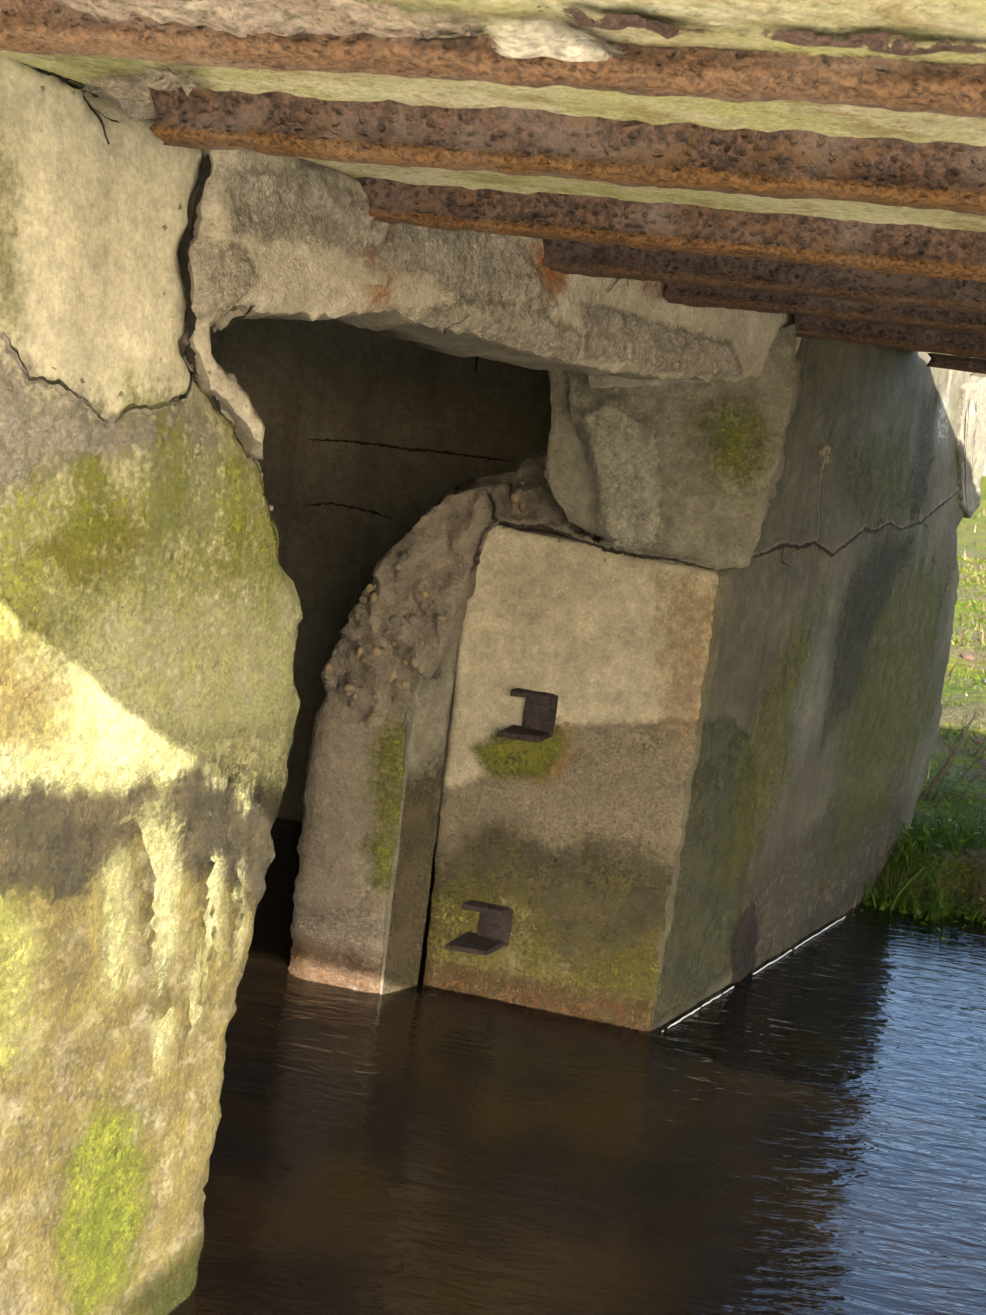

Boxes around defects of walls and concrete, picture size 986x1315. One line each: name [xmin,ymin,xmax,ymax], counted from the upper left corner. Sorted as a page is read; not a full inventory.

spalling [87,67,218,121]
spalling [53,0,986,62]
spalling [198,159,743,378]
crack [0,154,391,544]
spalling [0,351,217,493]
crack [307,438,514,462]
crack [497,514,716,570]
crack [752,400,977,566]
damp [911,386,949,521]
damp [792,536,914,766]
damp [0,627,297,1315]